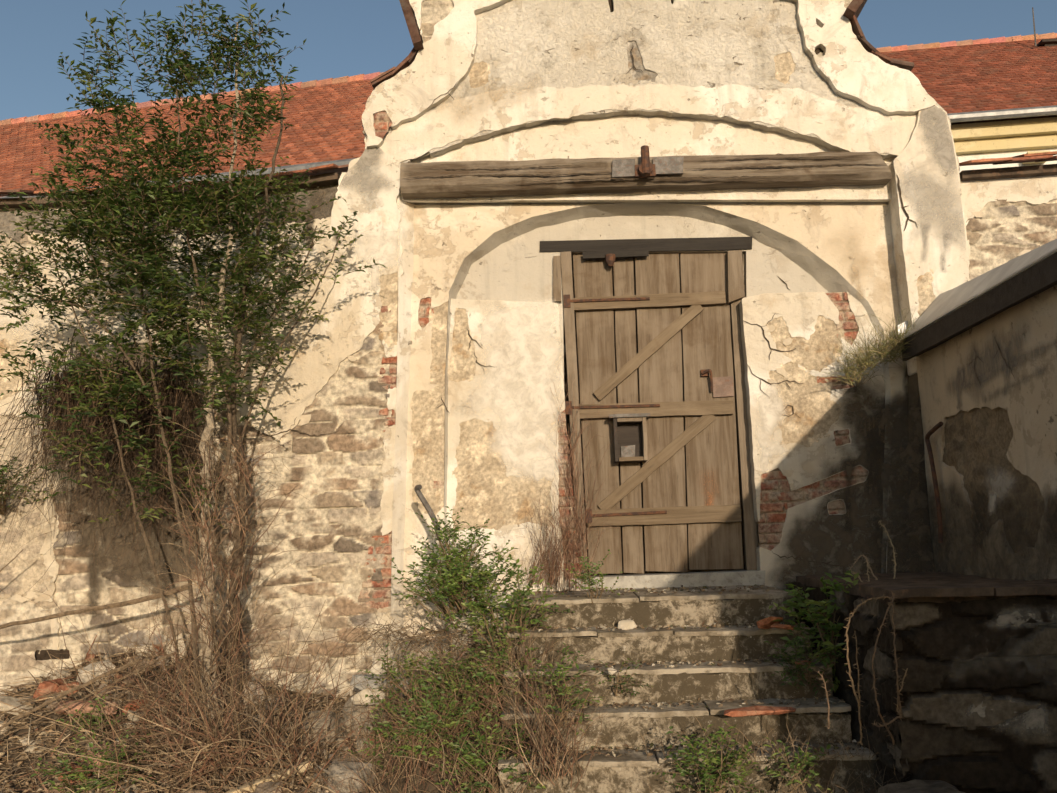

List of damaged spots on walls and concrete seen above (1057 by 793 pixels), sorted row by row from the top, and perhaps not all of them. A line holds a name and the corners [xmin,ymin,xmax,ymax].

spalling [420,0,454,42]
spalling [627,41,658,82]
flaking render [373,112,392,139]
crack [896,174,918,231]
spalling [966,199,1057,280]
crack [467,329,493,367]
crack [745,314,803,417]
peeling [765,292,859,447]
spalling [0,272,398,696]
peeling [409,298,583,579]
flaking render [758,466,867,551]
damp [776,366,1057,592]